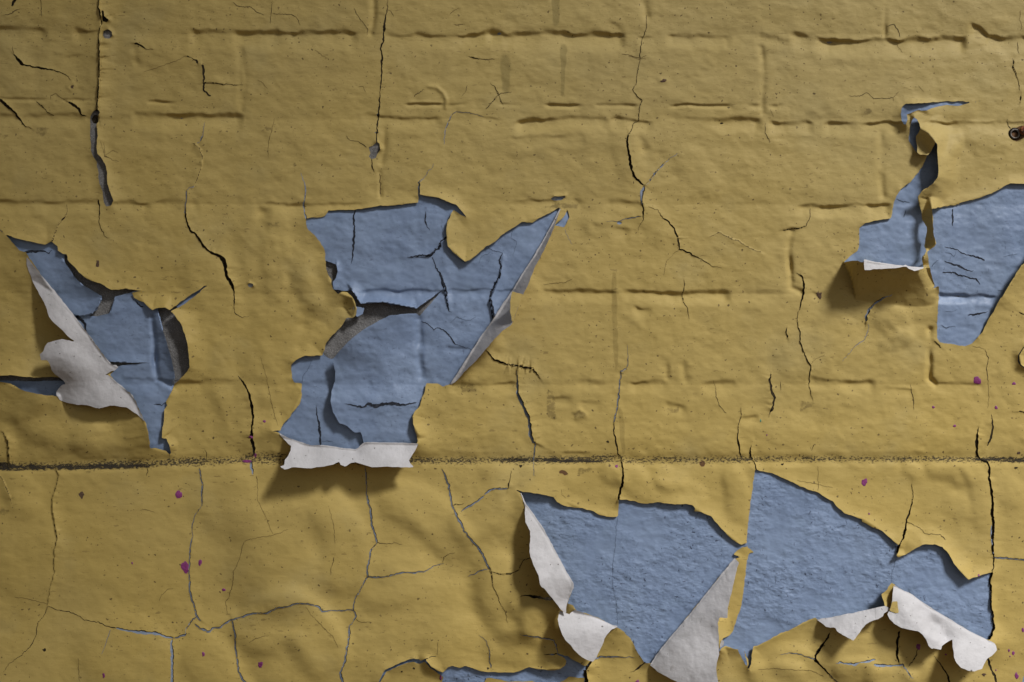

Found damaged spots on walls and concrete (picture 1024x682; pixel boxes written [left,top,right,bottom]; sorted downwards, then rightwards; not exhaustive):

crack [0,0,119,162]
peeling [0,230,206,455]
crack [184,123,249,318]
crack [350,2,392,194]
peeling [274,183,569,469]
crack [607,15,711,316]
crack [785,273,891,397]
peeling [845,101,1024,346]
crack [5,350,558,682]
peeling [379,470,997,682]
crack [975,348,1024,682]